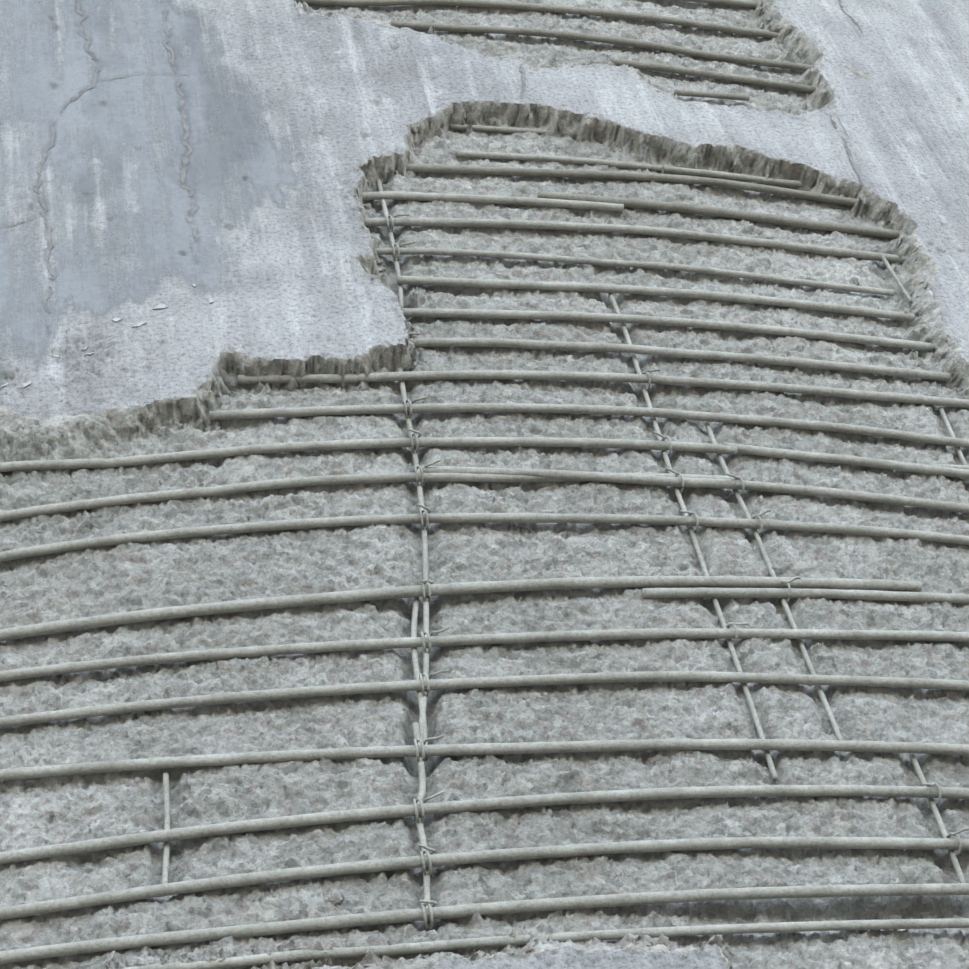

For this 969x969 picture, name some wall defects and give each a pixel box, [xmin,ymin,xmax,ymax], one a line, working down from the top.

crack [7,0,134,336]
crack [163,9,199,264]
spalling [293,0,838,116]
spalling [0,101,969,852]
spalling [0,796,969,907]
spalling [0,848,969,969]